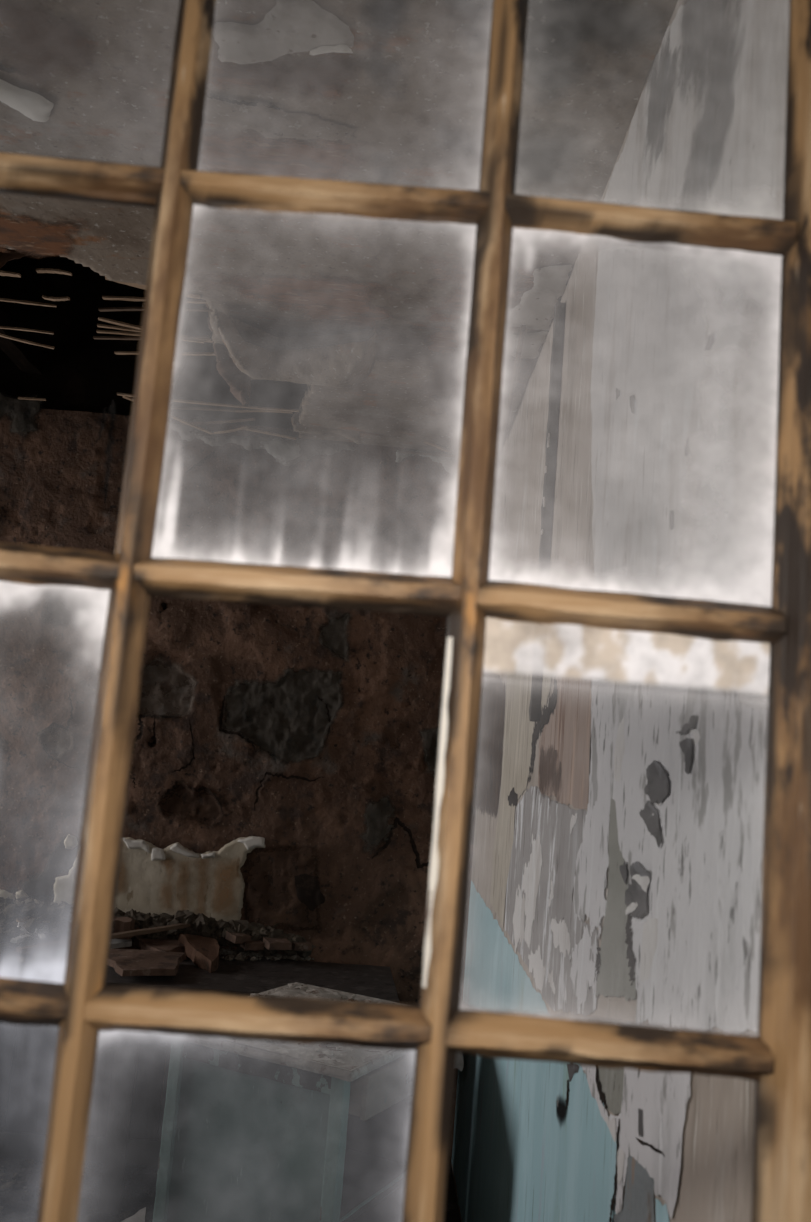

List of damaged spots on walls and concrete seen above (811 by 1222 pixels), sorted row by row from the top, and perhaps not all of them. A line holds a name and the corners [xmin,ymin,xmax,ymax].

flaking render [214,0,354,64]
peeling [0,79,54,122]
peeling [603,0,790,218]
flaking render [506,265,573,359]
peeling [590,244,779,607]
spalling [44,591,82,627]
peeling [476,671,769,1033]
peeling [556,1098,567,1123]
peeling [567,1064,691,1222]